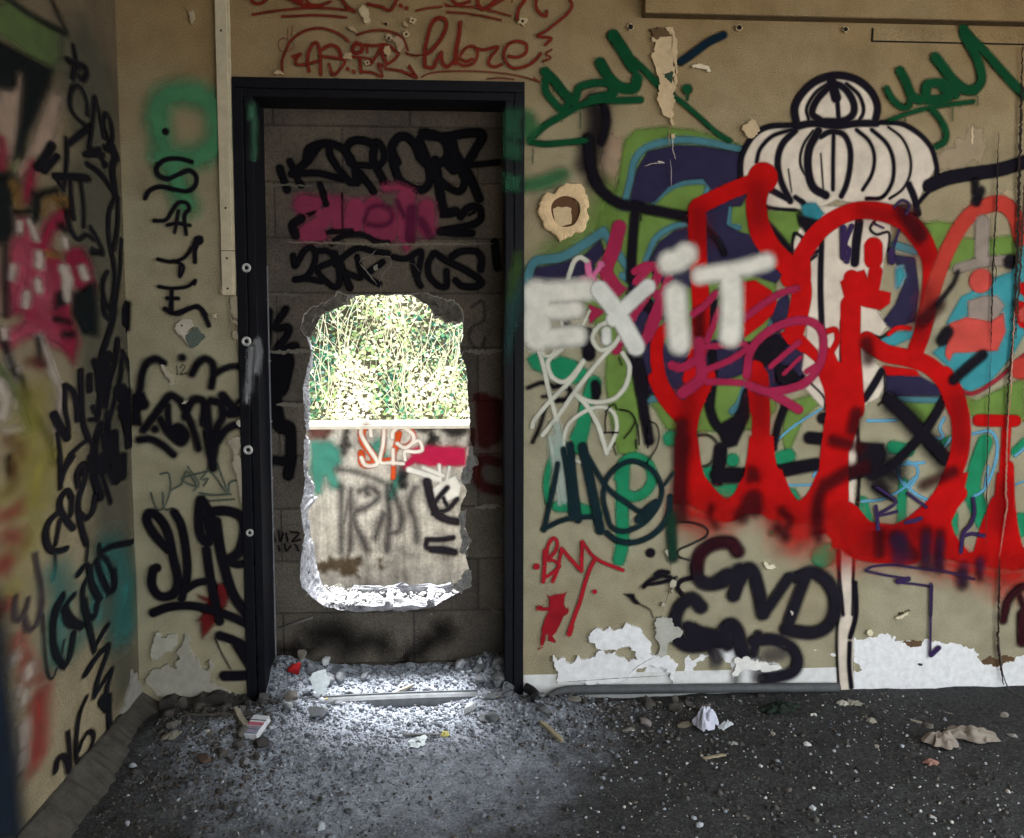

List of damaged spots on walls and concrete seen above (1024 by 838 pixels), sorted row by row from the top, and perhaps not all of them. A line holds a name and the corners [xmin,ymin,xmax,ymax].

peeling [664,27,678,88]
spalling [537,183,589,242]
spalling [300,291,472,615]
spalling [460,442,479,485]
peeling [119,630,237,714]
peeling [552,615,782,685]
peeling [847,628,1024,706]